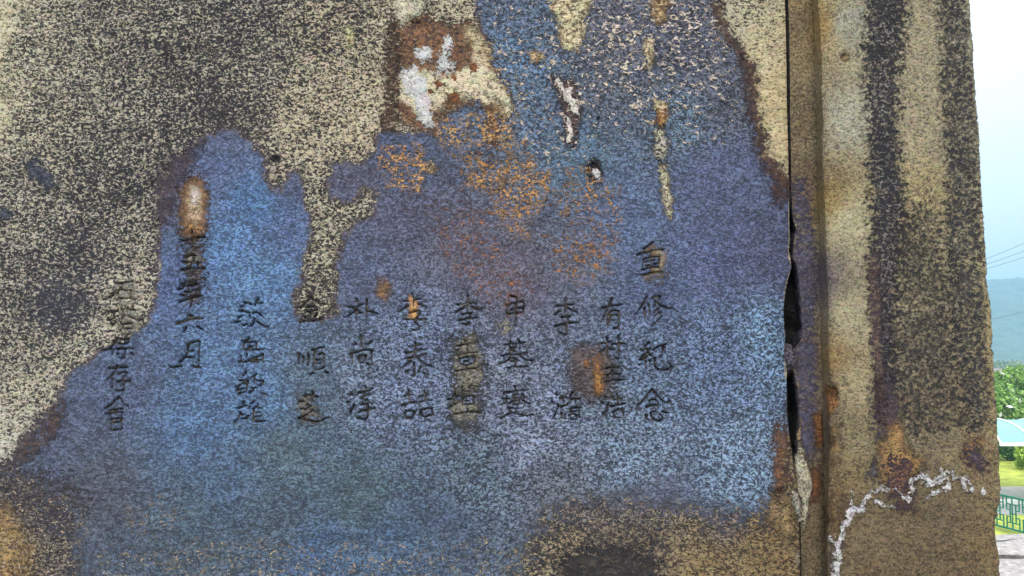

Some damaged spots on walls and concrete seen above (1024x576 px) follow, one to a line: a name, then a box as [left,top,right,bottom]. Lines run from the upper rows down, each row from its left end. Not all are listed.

corrosion [149,139,206,230]
corrosion [369,20,621,314]
spalling [387,0,744,183]
crack [783,0,809,470]
damp [855,0,997,444]
corrosion [566,341,619,408]
corrosion [864,250,927,516]
crack [796,495,804,576]